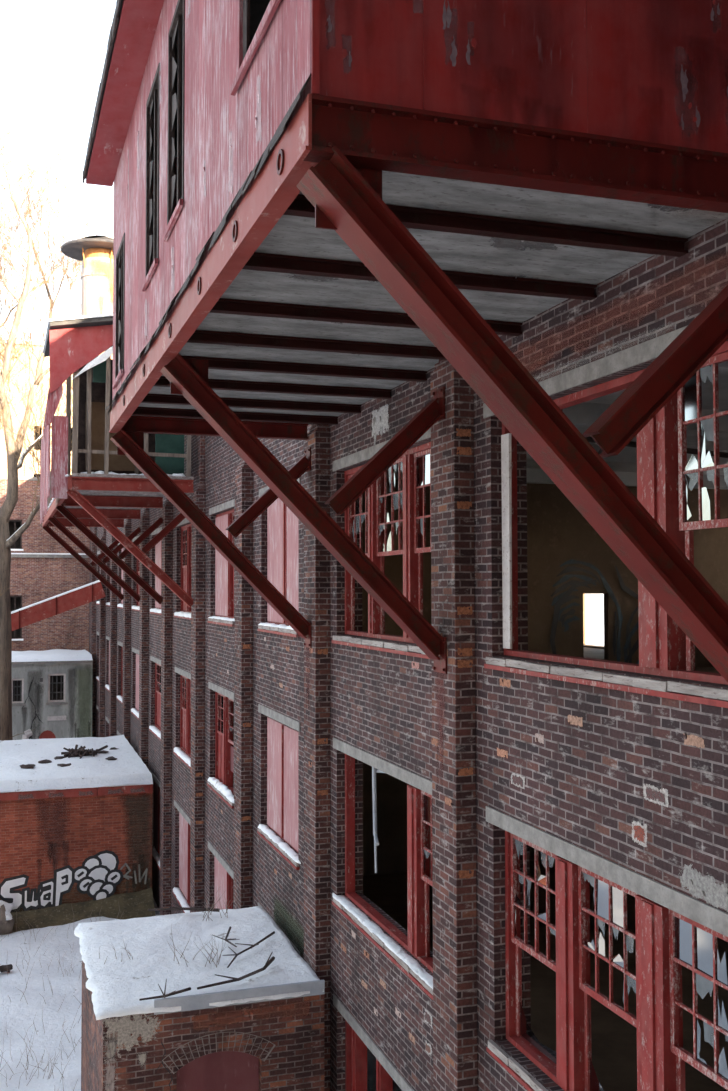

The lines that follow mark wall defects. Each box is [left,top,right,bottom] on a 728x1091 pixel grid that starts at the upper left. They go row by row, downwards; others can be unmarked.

peeling [443,0,477,66]
peeling [680,64,700,130]
spalling [102,1014,160,1066]